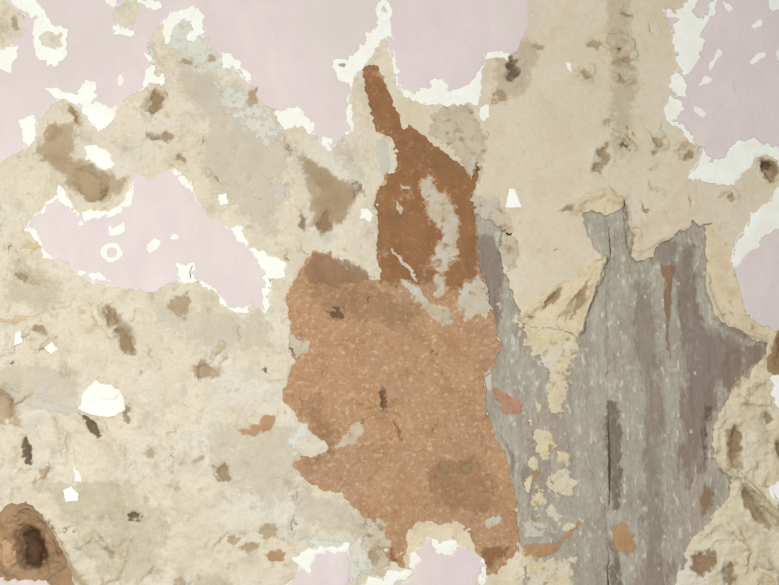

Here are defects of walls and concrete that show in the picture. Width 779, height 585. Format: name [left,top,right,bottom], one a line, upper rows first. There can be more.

spalling [0,0,524,585]
spalling [392,0,779,585]